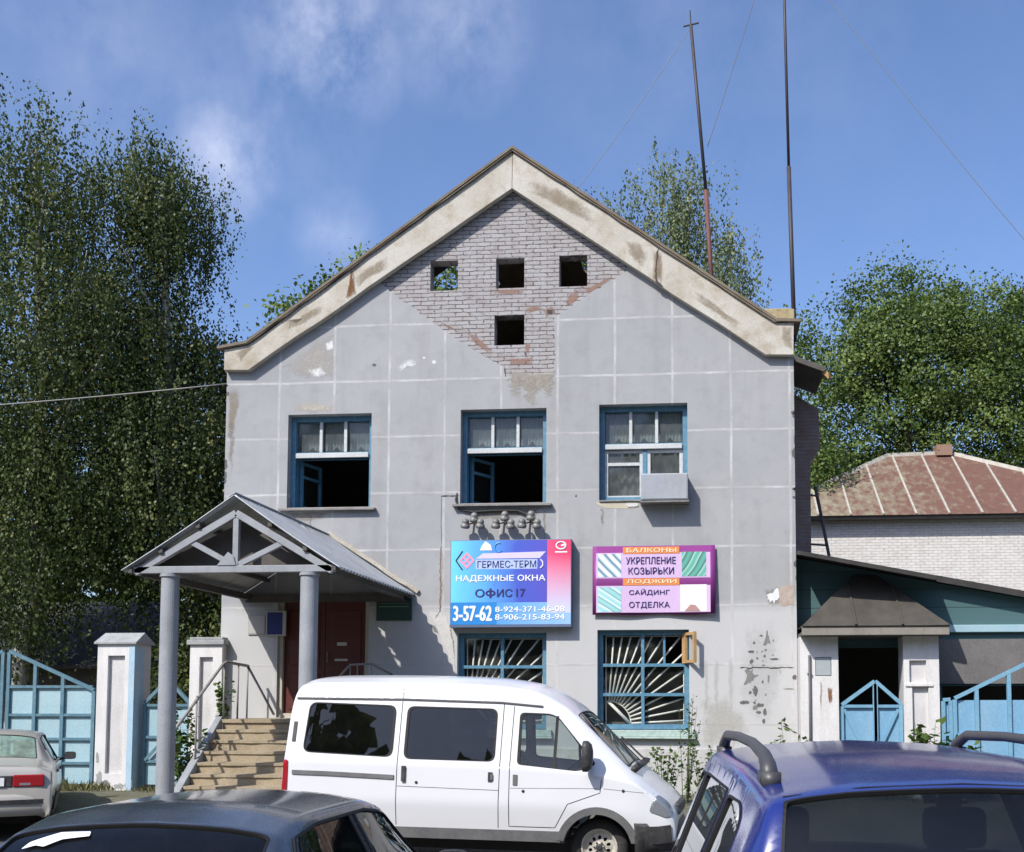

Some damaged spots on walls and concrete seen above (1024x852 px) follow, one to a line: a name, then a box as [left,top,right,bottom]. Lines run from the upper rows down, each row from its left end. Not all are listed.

spalling [567,279,609,304]
flaking render [767,561,796,607]
peeling [740,631,778,724]